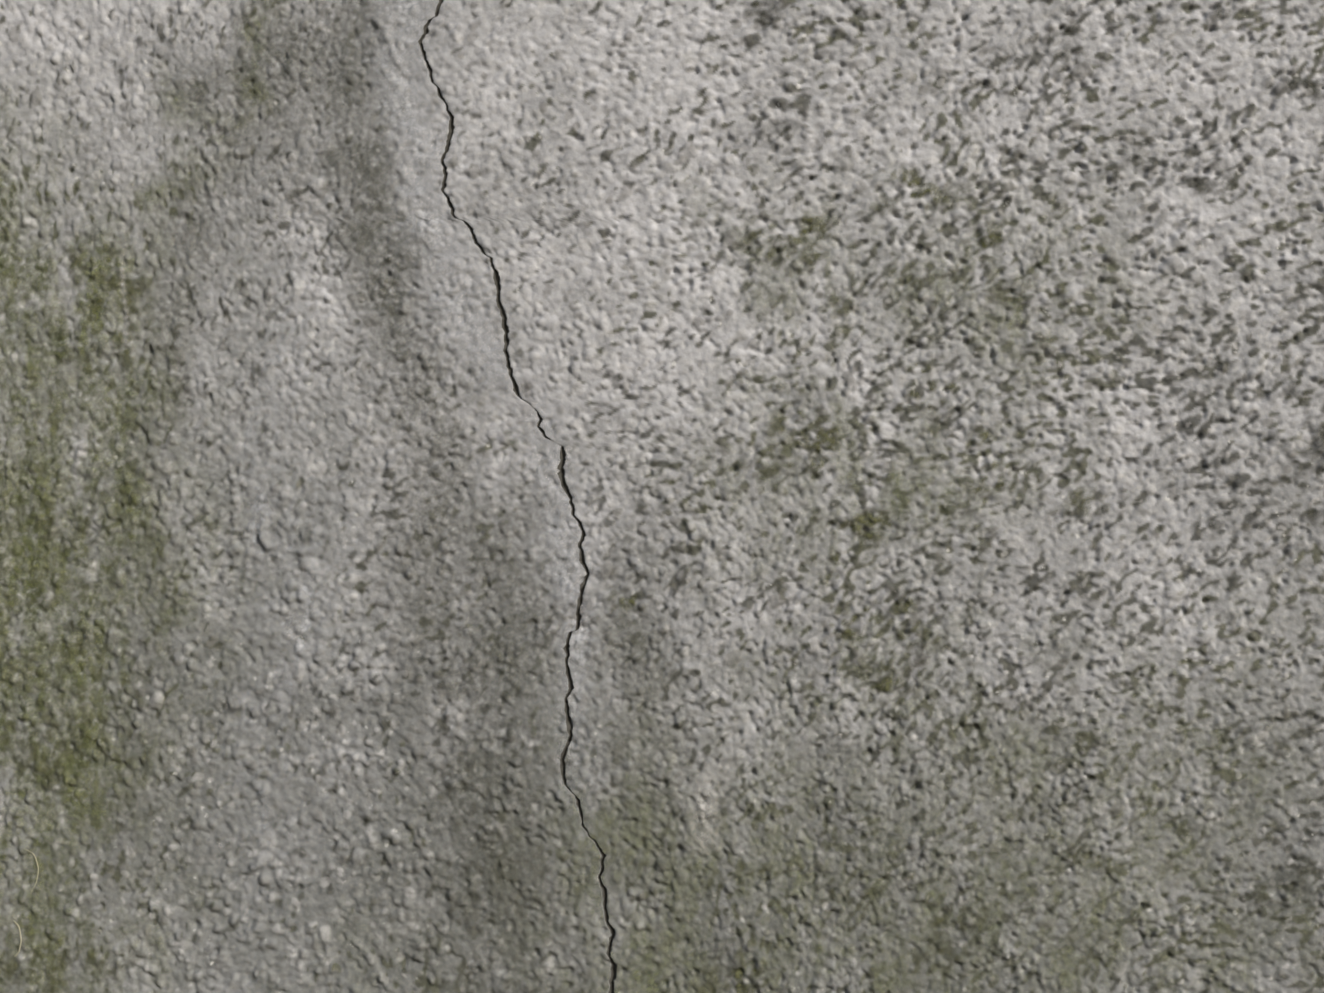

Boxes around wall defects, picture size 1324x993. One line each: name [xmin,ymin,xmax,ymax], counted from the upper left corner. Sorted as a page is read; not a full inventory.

crack [418,0,617,993]